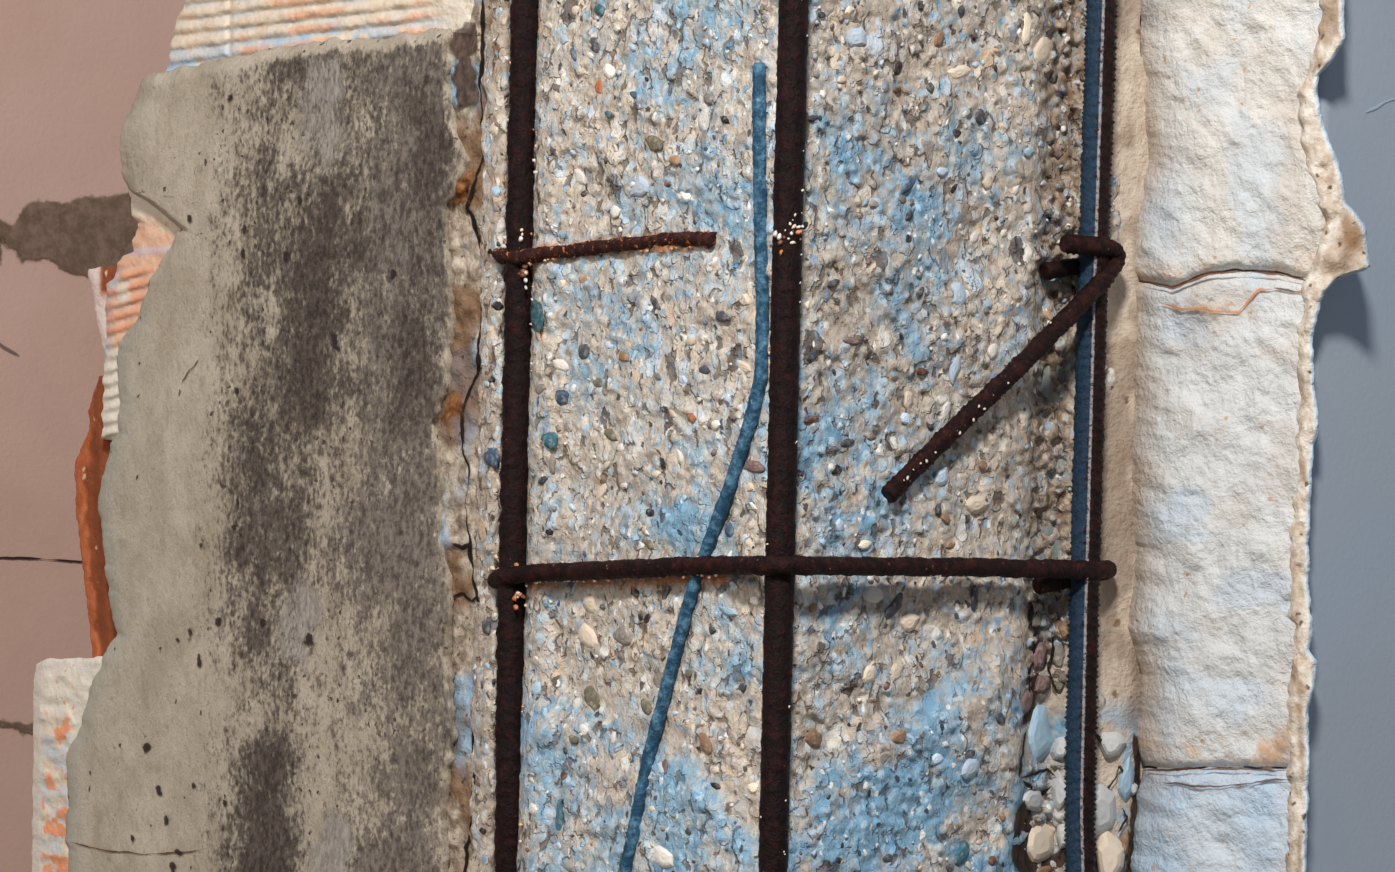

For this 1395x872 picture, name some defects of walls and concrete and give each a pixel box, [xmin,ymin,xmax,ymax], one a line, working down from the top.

crack [454,0,485,249]
water stain [195,40,467,872]
crack [452,307,482,602]
crack [463,732,476,872]
spalling [469,0,512,872]
spalling [517,575,765,872]
spalling [526,0,779,565]
rust [577,574,730,588]
spalling [787,575,1070,872]
spalling [795,0,1087,560]
crack [1140,767,1288,788]
crack [1140,270,1305,313]